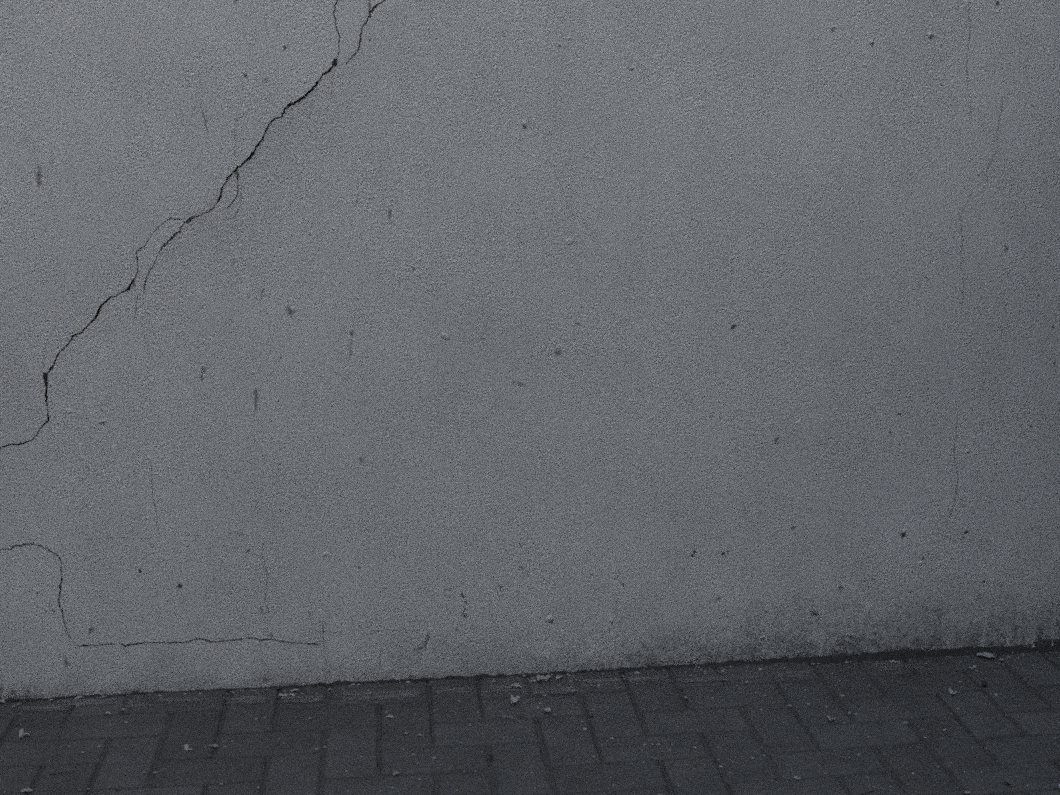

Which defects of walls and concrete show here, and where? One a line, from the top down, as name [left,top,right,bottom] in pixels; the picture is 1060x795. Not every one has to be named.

crack [0,0,385,449]
crack [0,543,319,648]